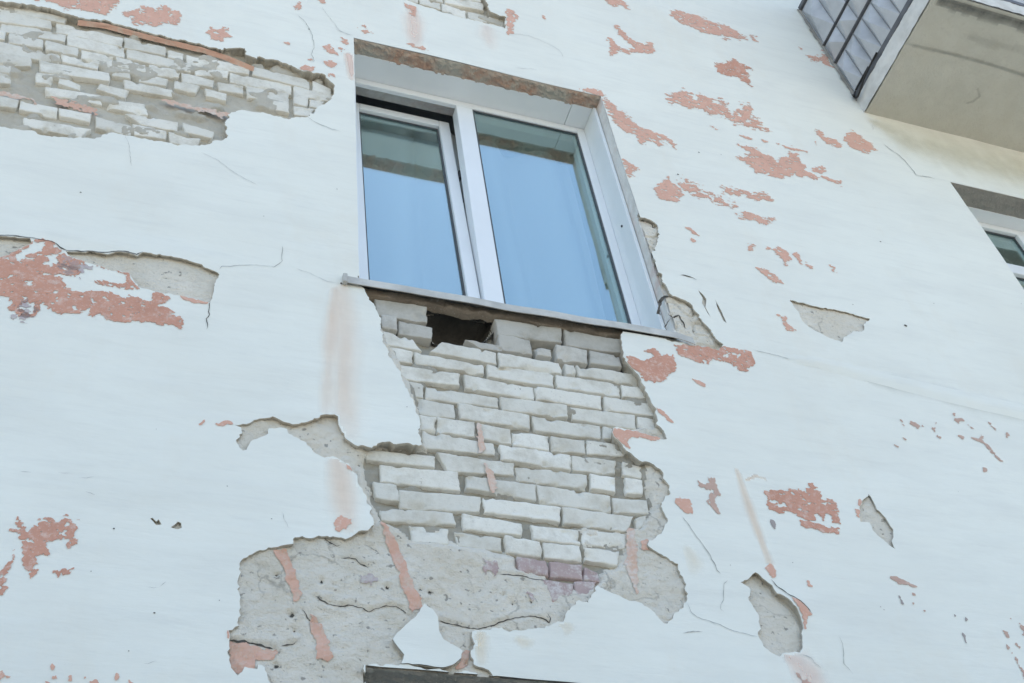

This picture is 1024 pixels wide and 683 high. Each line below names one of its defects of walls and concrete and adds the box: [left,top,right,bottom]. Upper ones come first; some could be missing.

peeling [669,9,759,42]
spalling [0,0,677,150]
peeling [714,58,754,87]
peeling [664,87,876,187]
peeling [654,174,775,225]
peeling [0,236,219,329]
spalling [776,300,870,342]
spalling [199,217,755,683]
peeling [0,514,80,595]
peeling [764,483,841,534]
spalling [855,494,894,548]
spalling [741,564,812,656]